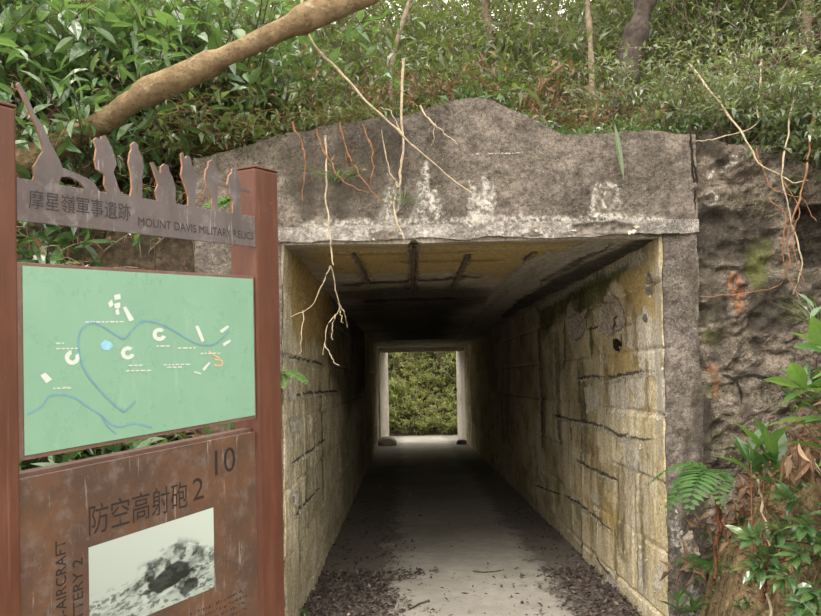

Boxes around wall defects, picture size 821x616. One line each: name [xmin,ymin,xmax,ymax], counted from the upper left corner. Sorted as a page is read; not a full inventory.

water stain [306,162,577,228]
spalling [408,243,420,293]
rust [314,242,572,278]
rust [291,251,336,386]
crack [577,369,656,389]
crack [552,399,652,484]
crack [535,485,616,584]